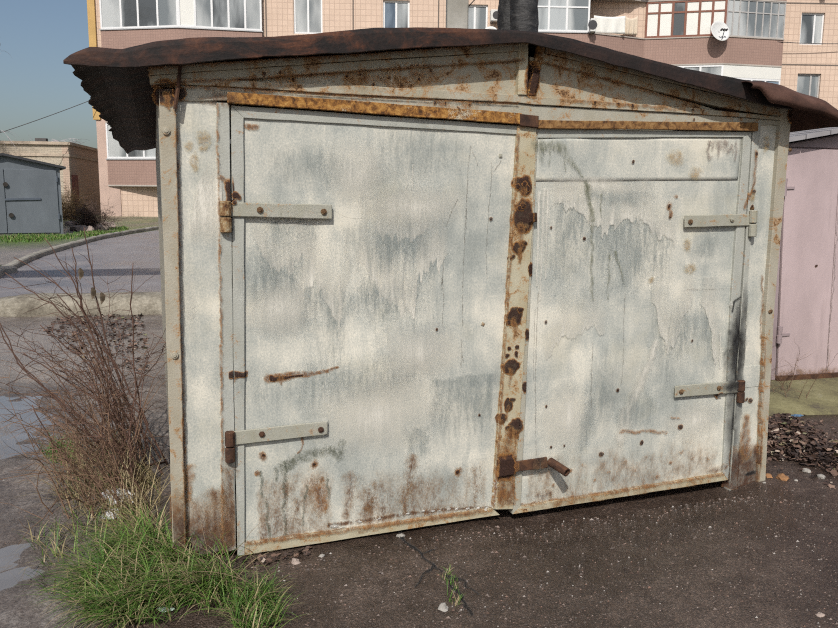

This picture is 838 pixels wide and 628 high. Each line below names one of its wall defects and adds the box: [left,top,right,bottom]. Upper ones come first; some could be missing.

rust [149,48,695,121]
rust [170,131,764,561]
crack [399,531,479,615]